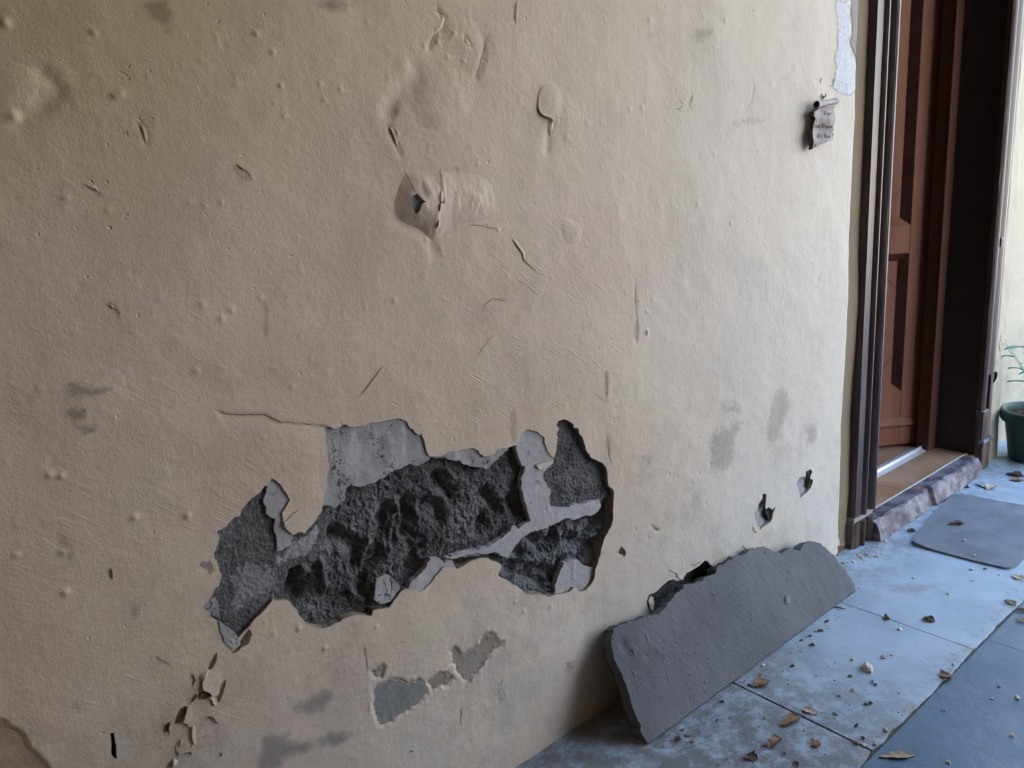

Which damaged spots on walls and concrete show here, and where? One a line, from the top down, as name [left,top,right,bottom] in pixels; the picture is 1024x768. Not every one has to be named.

spalling [850,0,858,57]
crack [222,412,326,427]
spalling [797,469,811,497]
spalling [200,418,610,653]
spalling [752,494,771,533]
spalling [647,562,713,614]
peeling [372,633,502,724]
peeling [164,653,226,768]